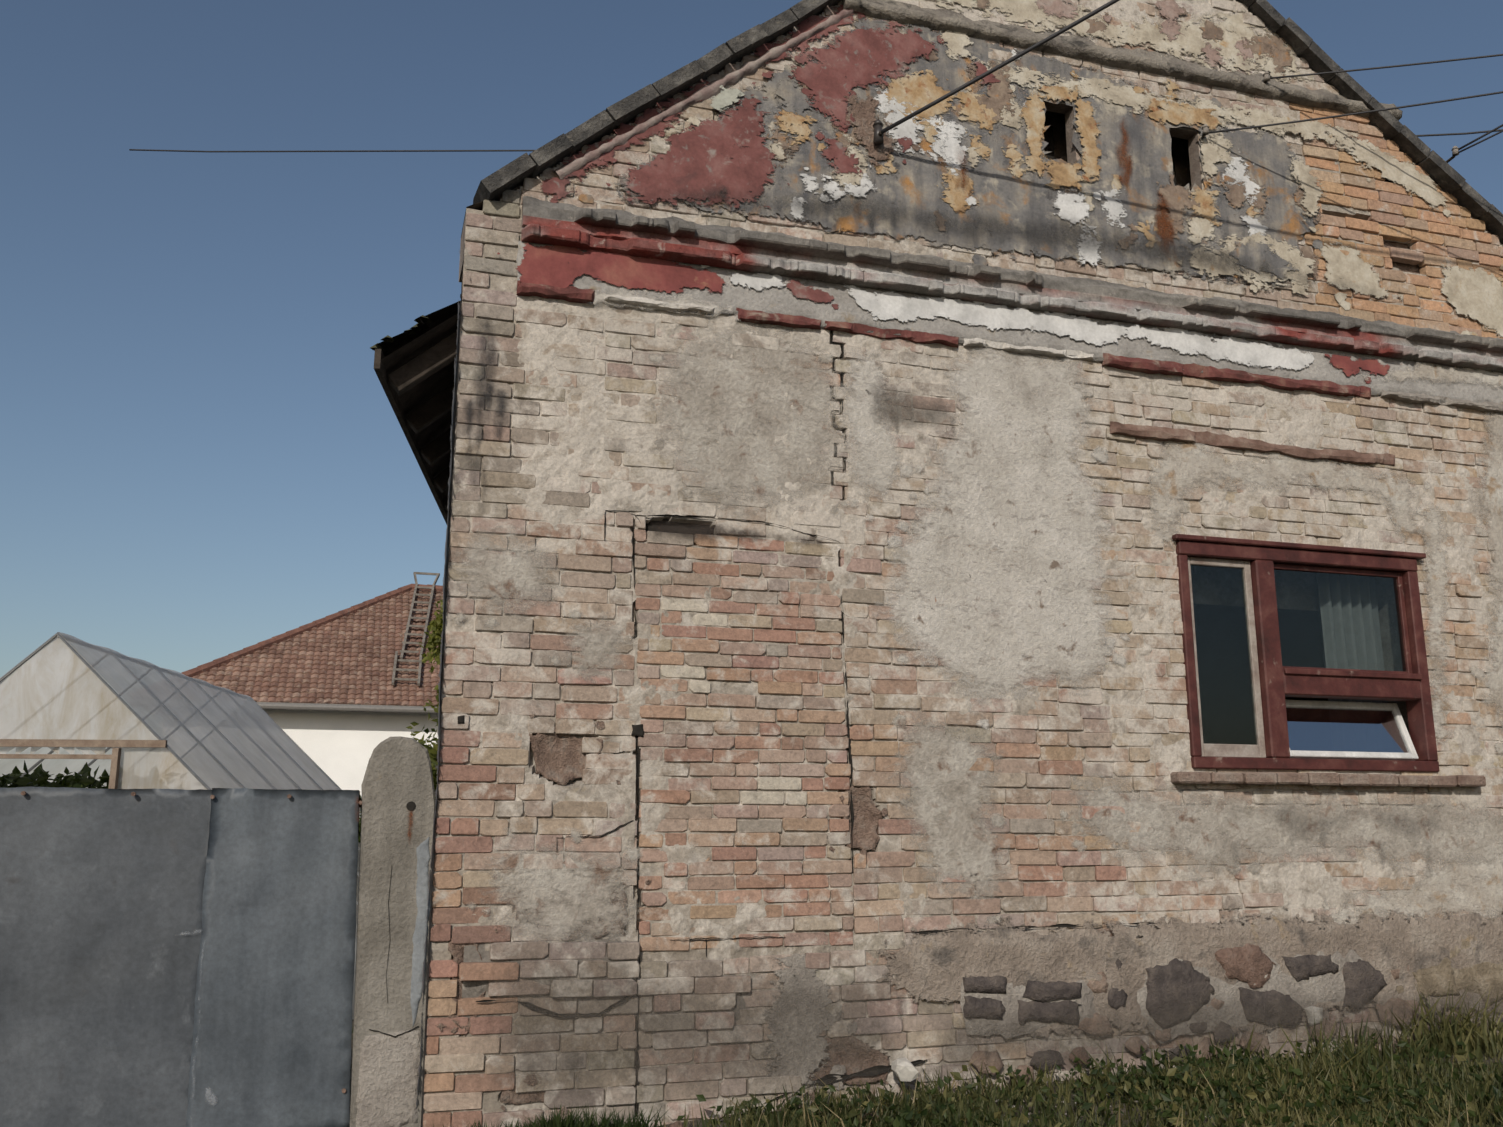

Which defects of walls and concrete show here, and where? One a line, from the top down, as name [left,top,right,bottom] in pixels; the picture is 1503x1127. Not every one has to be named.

peeling [540,0,1451,310]
peeling [515,238,1503,388]
hole [644,519,714,535]
spalling [356,301,486,1127]
spalling [529,714,605,785]
spalling [631,724,644,737]
spalling [829,786,888,855]
spalling [561,888,628,941]
peeling [1304,1006,1323,1026]
spalling [807,1035,890,1100]